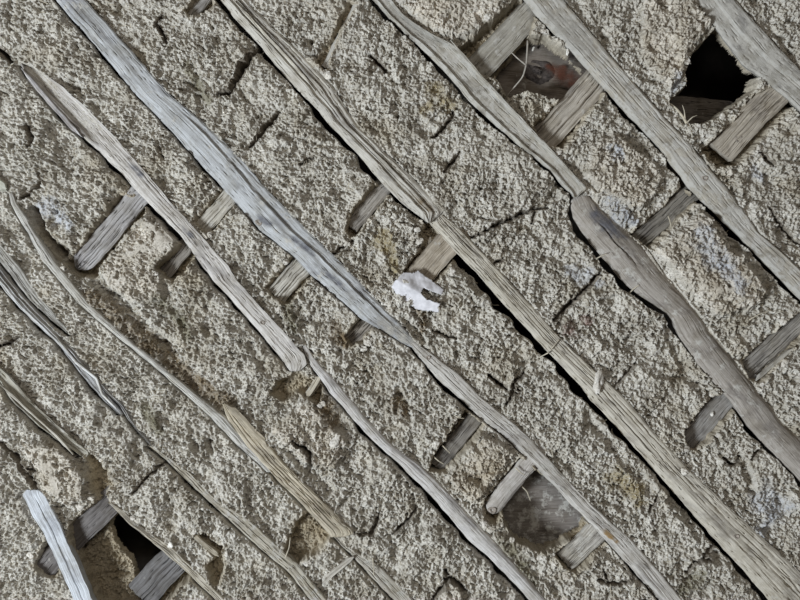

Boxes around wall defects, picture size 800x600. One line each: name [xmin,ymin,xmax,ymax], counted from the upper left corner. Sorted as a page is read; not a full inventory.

spalling [457,0,523,58]
spalling [480,17,582,134]
spalling [544,91,607,156]
spalling [666,26,797,176]
spalling [63,449,154,600]
spalling [478,451,610,581]